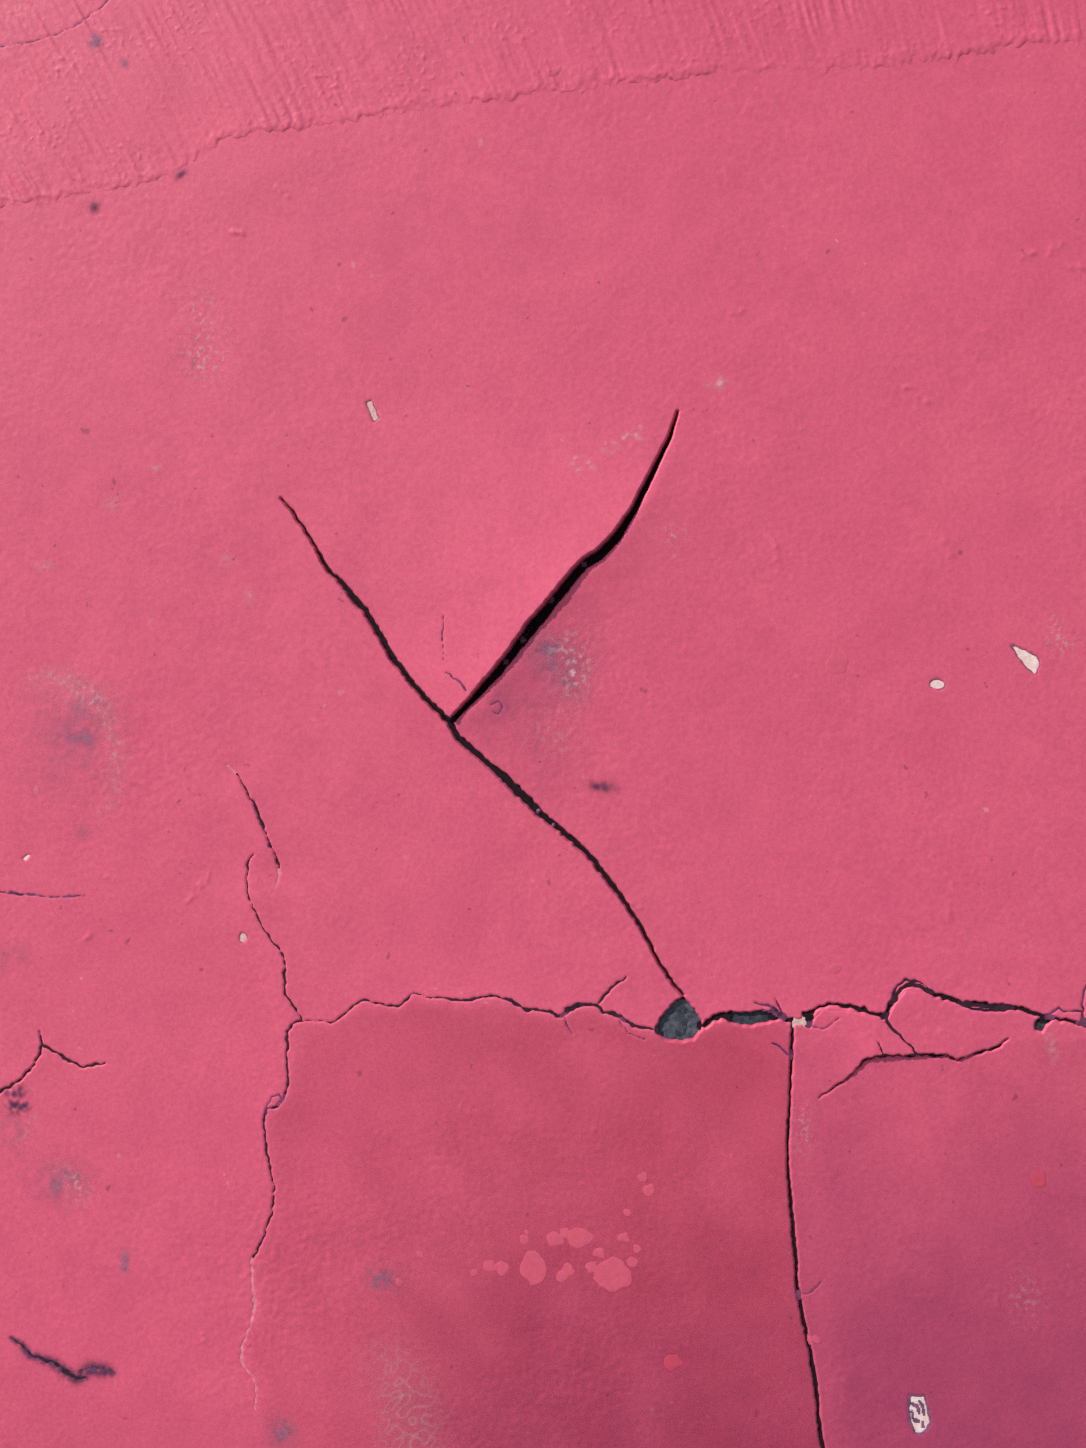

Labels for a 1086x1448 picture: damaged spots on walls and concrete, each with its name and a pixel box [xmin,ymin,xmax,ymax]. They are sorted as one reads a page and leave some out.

crack [0,0,109,48]
peeling [1010,644,1041,675]
crack [226,416,1086,1448]
crack [0,1035,106,1094]
crack [10,1337,115,1382]
peeling [907,1394,932,1435]